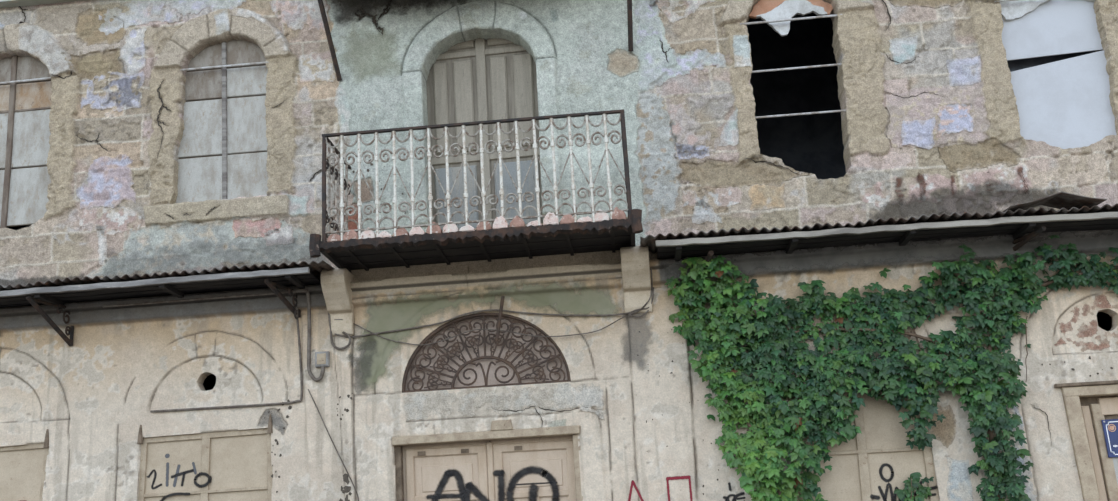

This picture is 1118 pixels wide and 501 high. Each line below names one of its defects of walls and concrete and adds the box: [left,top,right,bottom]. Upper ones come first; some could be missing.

peeling [0,0,351,140]
crack [355,2,390,35]
peeling [888,35,918,65]
spalling [888,0,963,8]
crack [156,80,171,163]
flaking render [607,0,808,225]
peeling [856,56,1033,208]
water stain [352,283,618,393]
spalling [1054,294,1118,359]